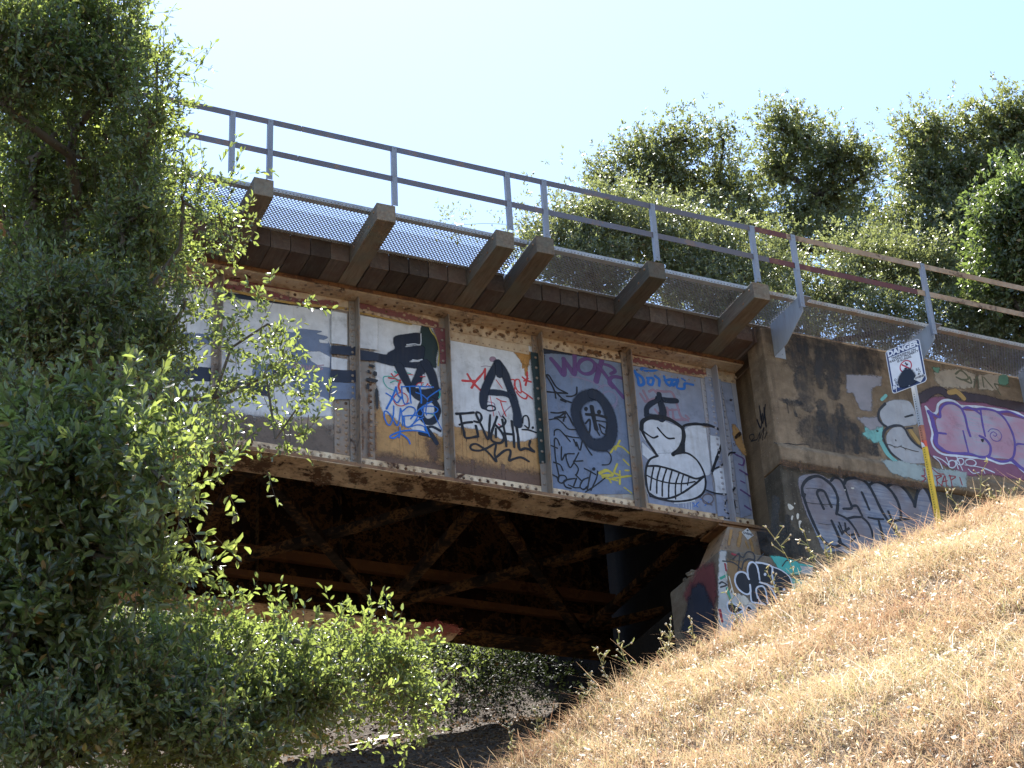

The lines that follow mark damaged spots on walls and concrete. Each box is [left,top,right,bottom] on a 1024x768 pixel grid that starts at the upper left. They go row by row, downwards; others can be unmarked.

water stain [782,329,882,456]
rust [346,469,369,485]
rust [548,499,692,536]